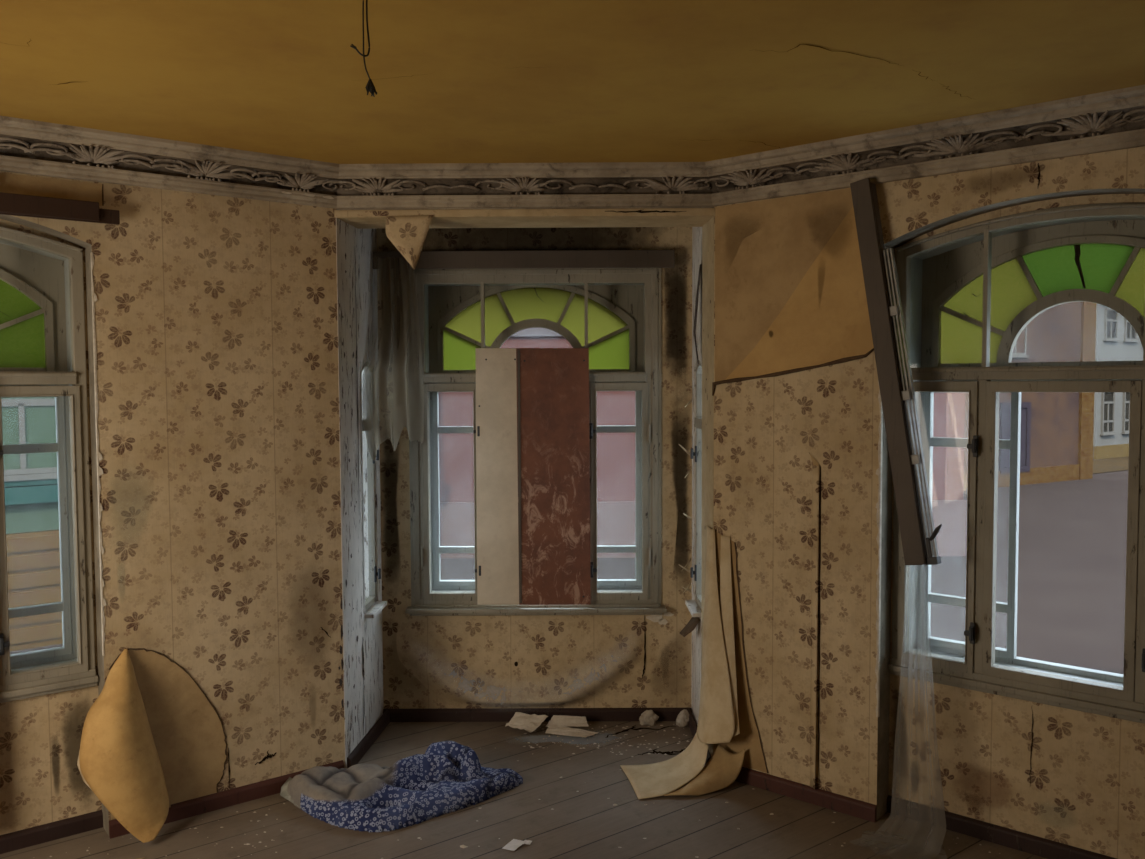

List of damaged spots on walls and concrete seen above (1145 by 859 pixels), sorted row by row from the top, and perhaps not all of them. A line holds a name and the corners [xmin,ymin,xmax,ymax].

crack [758,44,972,99]
flaking render [90,252,106,656]
peeling [714,531,767,773]